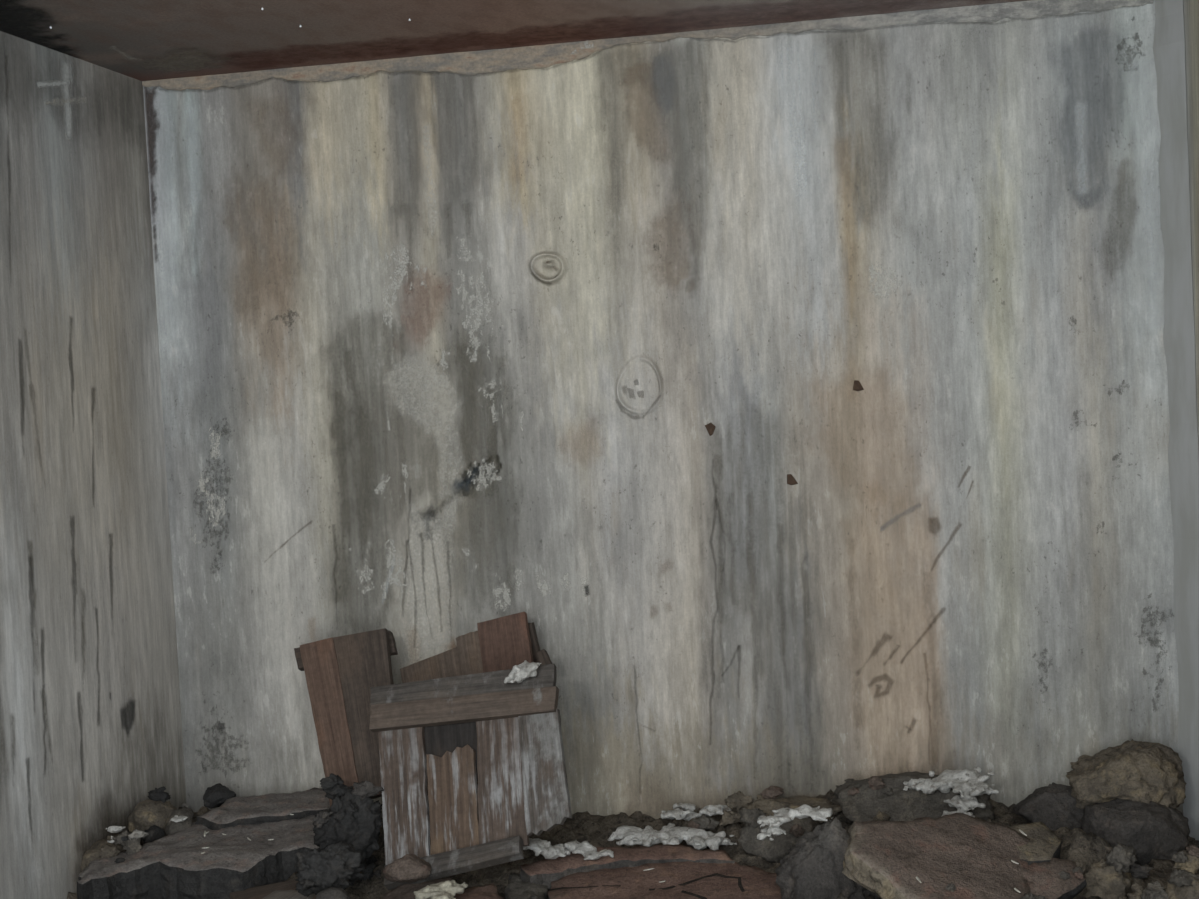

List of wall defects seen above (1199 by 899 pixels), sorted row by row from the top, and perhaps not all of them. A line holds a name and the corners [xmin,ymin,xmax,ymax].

damp [0,0,75,137]
crack [549,873,745,899]